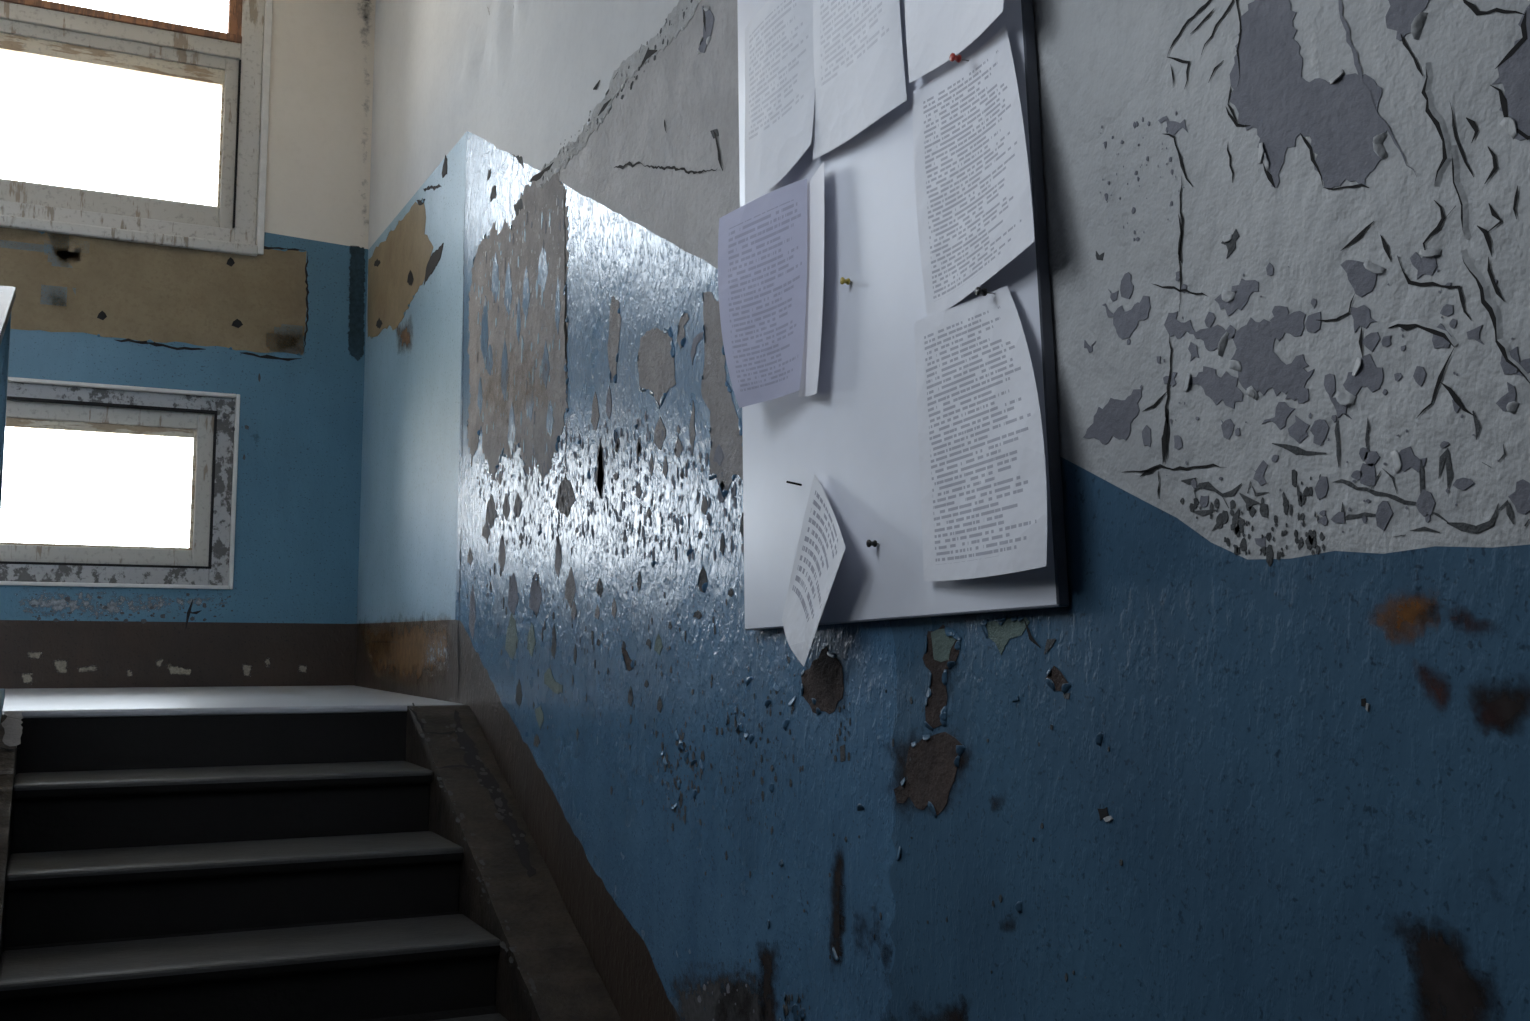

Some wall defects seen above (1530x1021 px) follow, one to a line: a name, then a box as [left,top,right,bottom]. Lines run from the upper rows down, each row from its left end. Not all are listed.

peeling [367,155,447,348]
peeling [466,0,864,876]
crack [614,120,723,174]
peeling [1083,385,1152,447]
crack [1122,177,1221,495]
peeling [1226,0,1388,190]
peeling [1103,249,1530,567]
peeling [1385,0,1429,41]
crack [1318,34,1530,417]
crack [1463,0,1525,16]
peeling [1490,4,1530,141]
peeling [892,625,969,818]